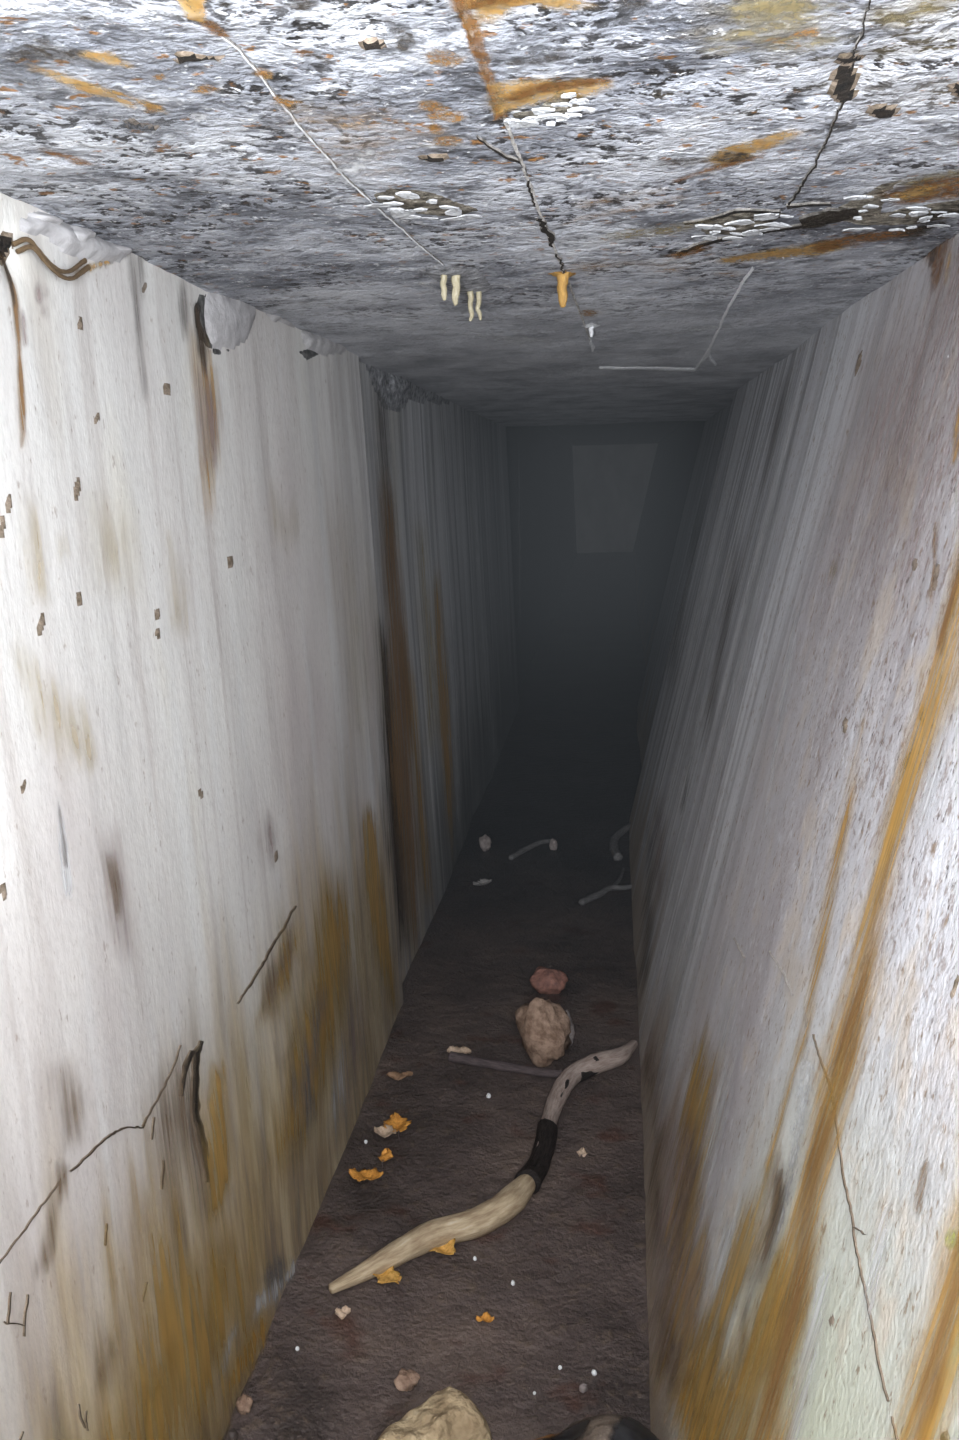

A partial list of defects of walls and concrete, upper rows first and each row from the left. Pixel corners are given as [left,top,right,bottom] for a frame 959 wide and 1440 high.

corrosion [426,0,609,120]
flaking render [364,189,482,220]
crack [476,135,565,274]
corrosion [663,132,793,181]
flaking render [691,213,793,241]
crack [676,0,871,257]
corrosion [721,208,916,276]
flaking render [838,181,959,232]
damp [899,202,959,240]
corrosion [754,567,959,1440]
crack [0,1045,182,1337]
crack [812,1034,899,1440]